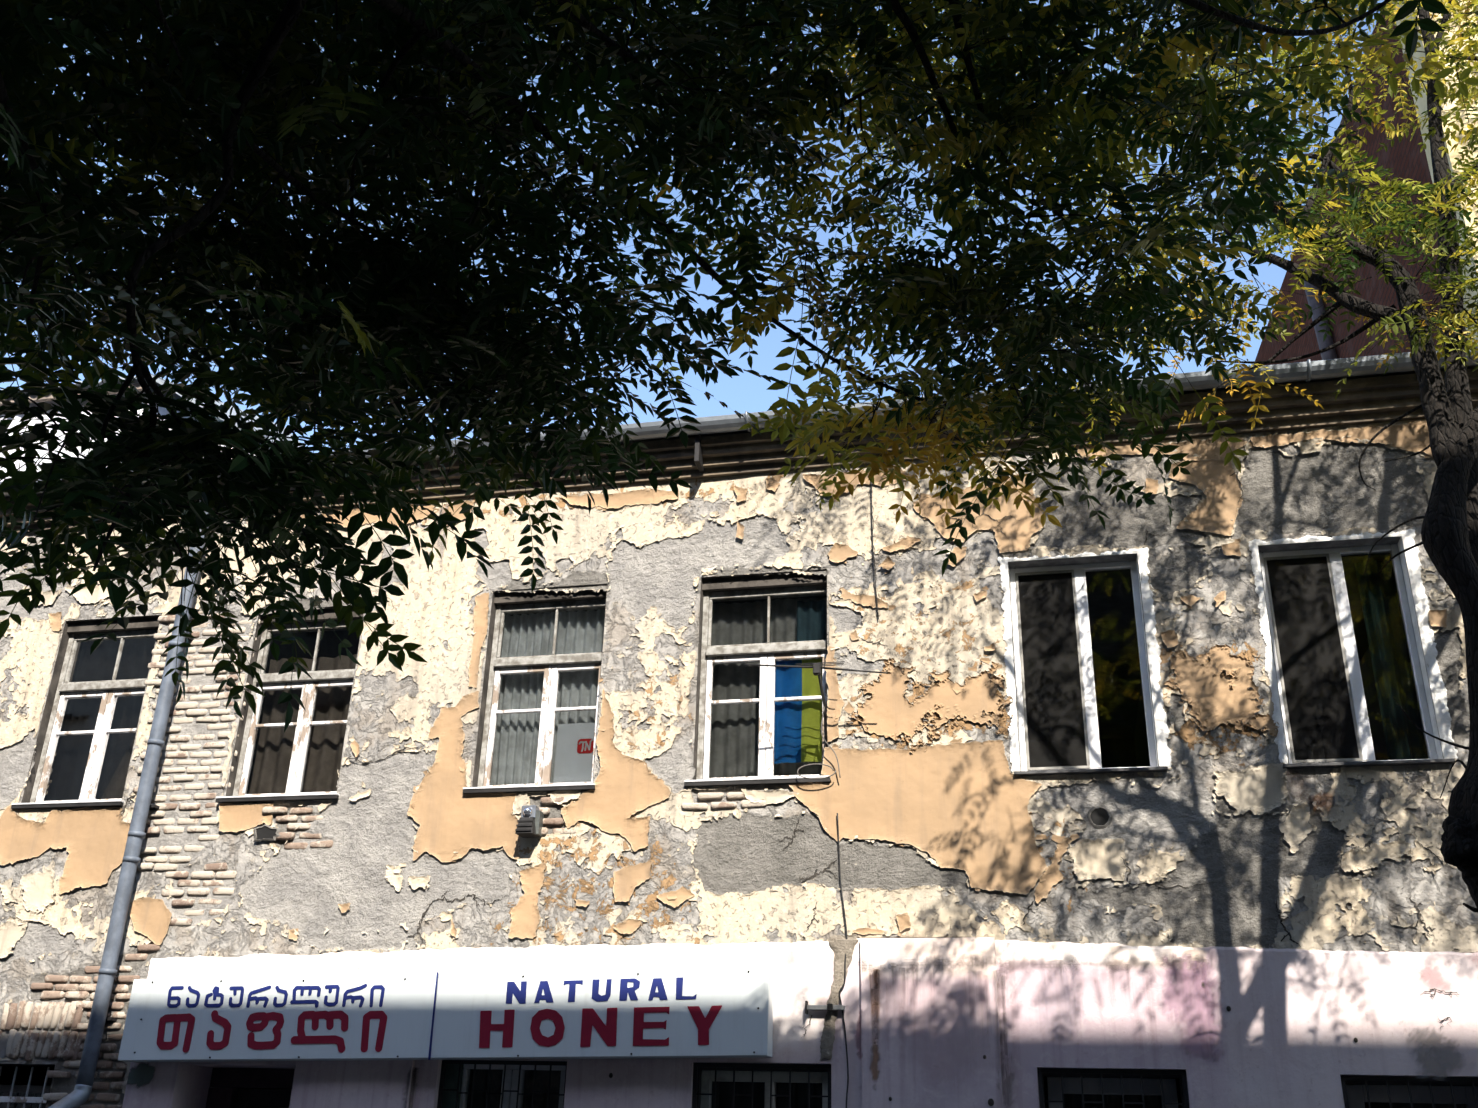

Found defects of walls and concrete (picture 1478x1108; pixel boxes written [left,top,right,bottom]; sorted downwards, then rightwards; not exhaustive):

spalling [0,486,1416,1108]
water stain [1165,956,1216,1057]